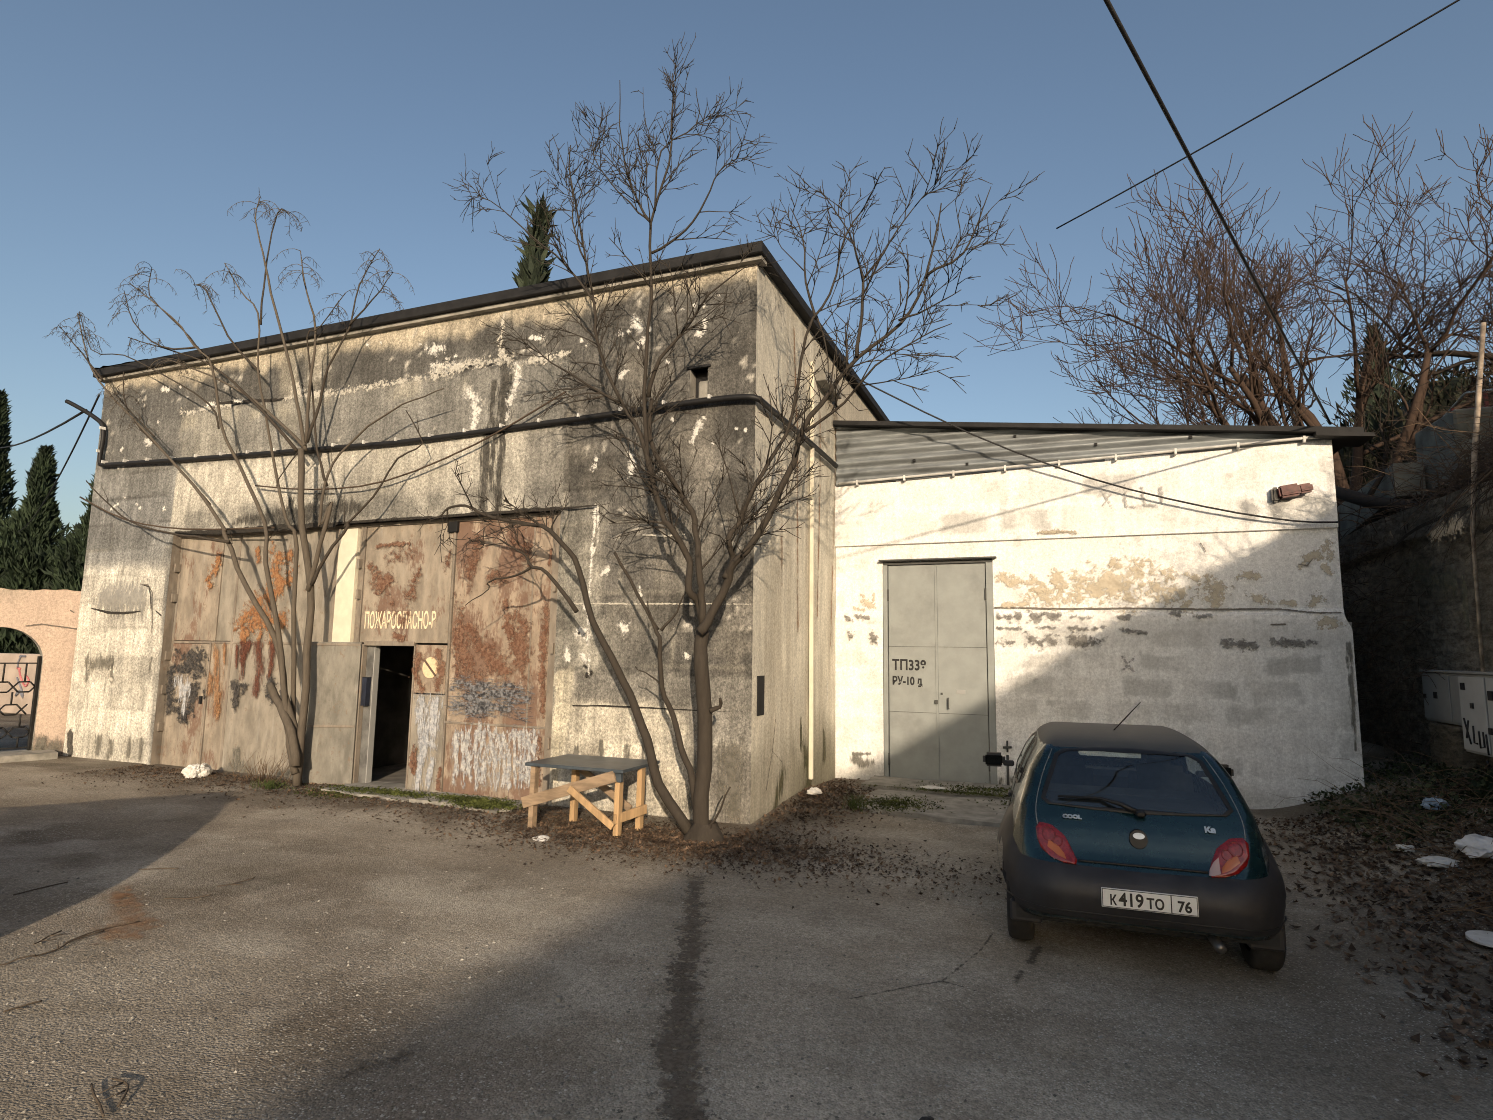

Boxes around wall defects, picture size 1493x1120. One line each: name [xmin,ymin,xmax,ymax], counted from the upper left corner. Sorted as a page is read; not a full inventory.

leakage [462,354,523,516]
rust [205,541,299,723]
rust [367,533,553,786]
peeling [995,554,1346,630]
peeling [1298,540,1335,575]